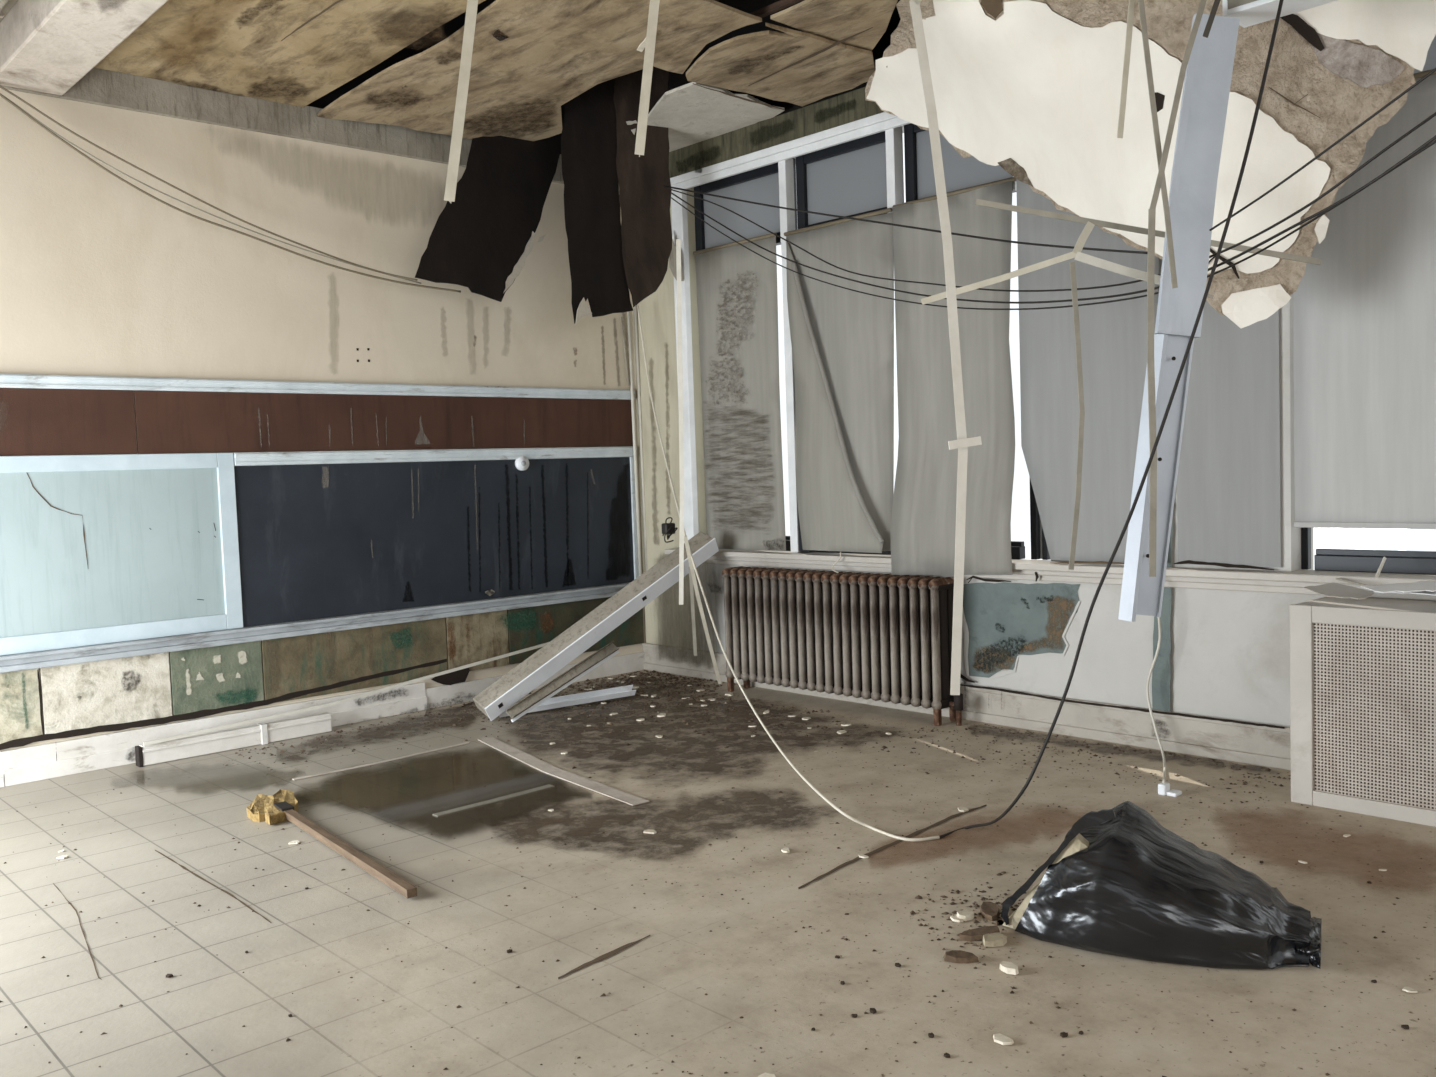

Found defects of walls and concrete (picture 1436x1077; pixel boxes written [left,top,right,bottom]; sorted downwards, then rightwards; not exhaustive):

flaking render [1313,33,1405,88]
water stain [368,85,417,108]
water stain [464,98,558,139]
water stain [751,120,792,145]
water stain [816,100,855,123]
flaking render [1155,92,1165,112]
flaking render [998,158,1033,186]
flaking render [1206,174,1338,328]
crack [26,472,88,566]
peeling [962,582,1081,679]
water stain [279,689,481,761]